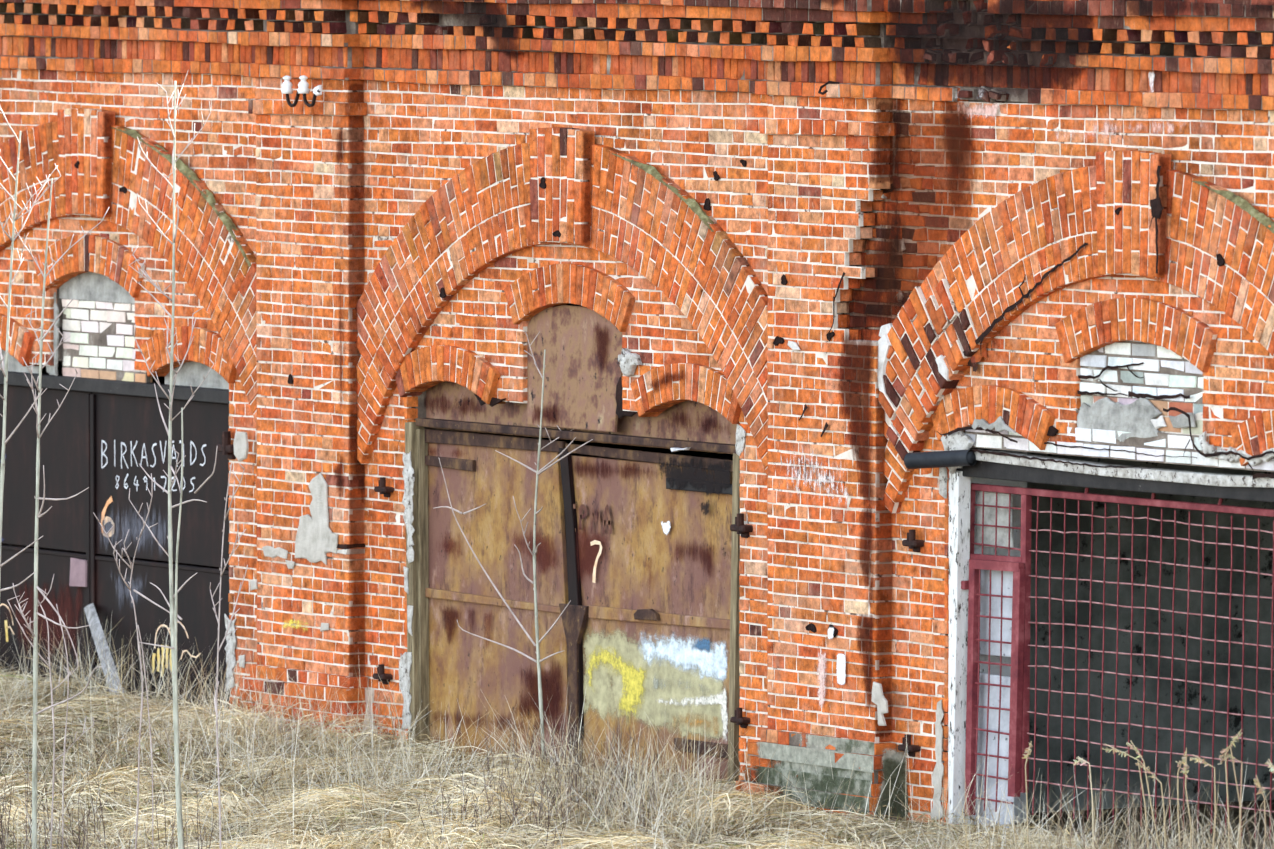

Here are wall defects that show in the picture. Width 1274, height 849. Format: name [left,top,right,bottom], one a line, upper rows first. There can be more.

rust [595,327,607,365]
rust [533,405,556,422]
rust [442,608,473,638]
rust [500,663,562,734]